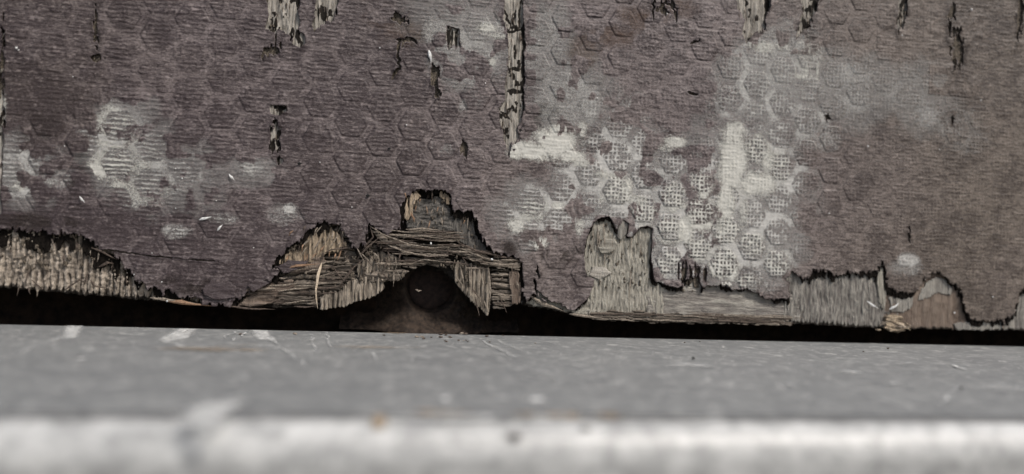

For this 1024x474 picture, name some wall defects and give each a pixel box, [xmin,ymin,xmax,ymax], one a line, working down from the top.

peeling [266,0,339,47]
peeling [499,0,526,157]
peeling [736,0,771,43]
crack [947,5,963,69]
crack [0,15,219,273]
peeling [0,227,237,308]
leakage [83,102,201,208]
crack [269,105,288,165]
peeling [404,191,421,221]
crack [282,189,710,318]
leakage [503,13,902,287]
peeling [576,216,1024,331]